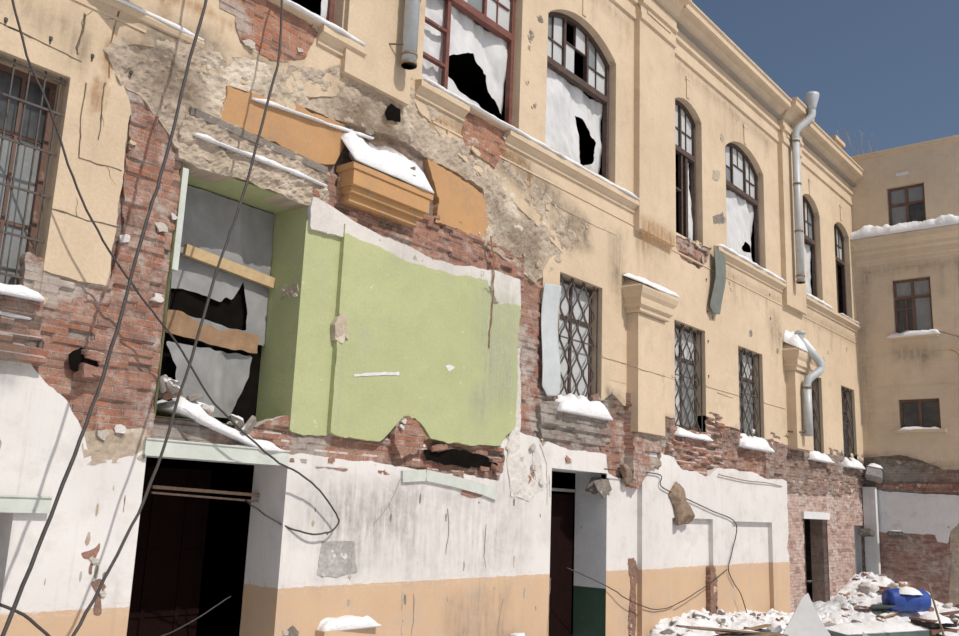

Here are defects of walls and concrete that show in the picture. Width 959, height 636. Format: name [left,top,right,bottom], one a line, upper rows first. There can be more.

flaking render [219,0,319,62]
peeling [275,92,296,113]
spalling [385,104,401,122]
flaking render [461,113,506,168]
flaking render [0,76,182,465]
flaking render [248,172,959,614]
flaking render [79,532,107,615]
flaking render [283,626,299,636]